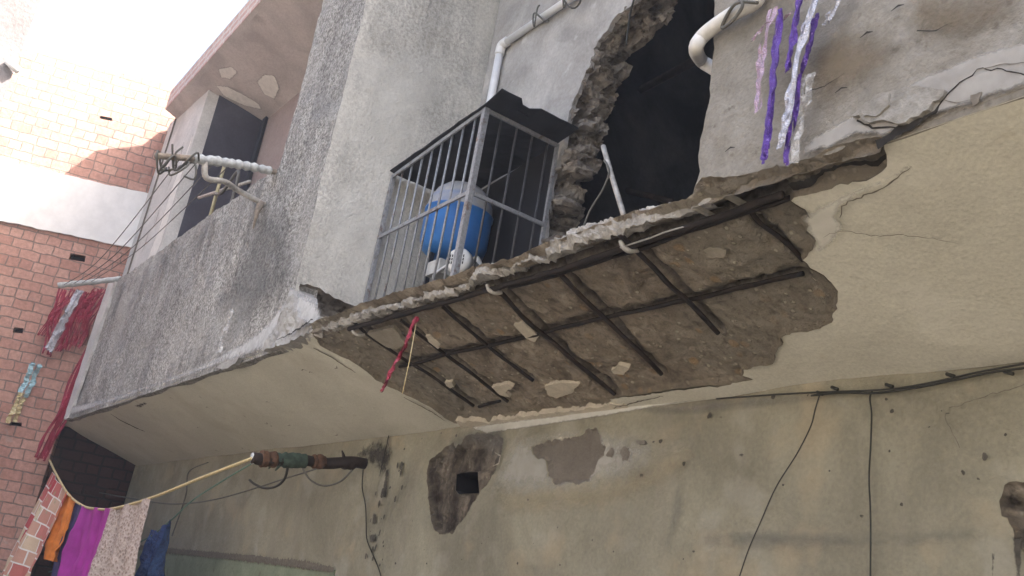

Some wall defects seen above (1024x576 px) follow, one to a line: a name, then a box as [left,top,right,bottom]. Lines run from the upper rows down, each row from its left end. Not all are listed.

peeling [217,67,279,109]
crack [857,62,1024,149]
crack [823,168,957,244]
spalling [263,0,887,535]